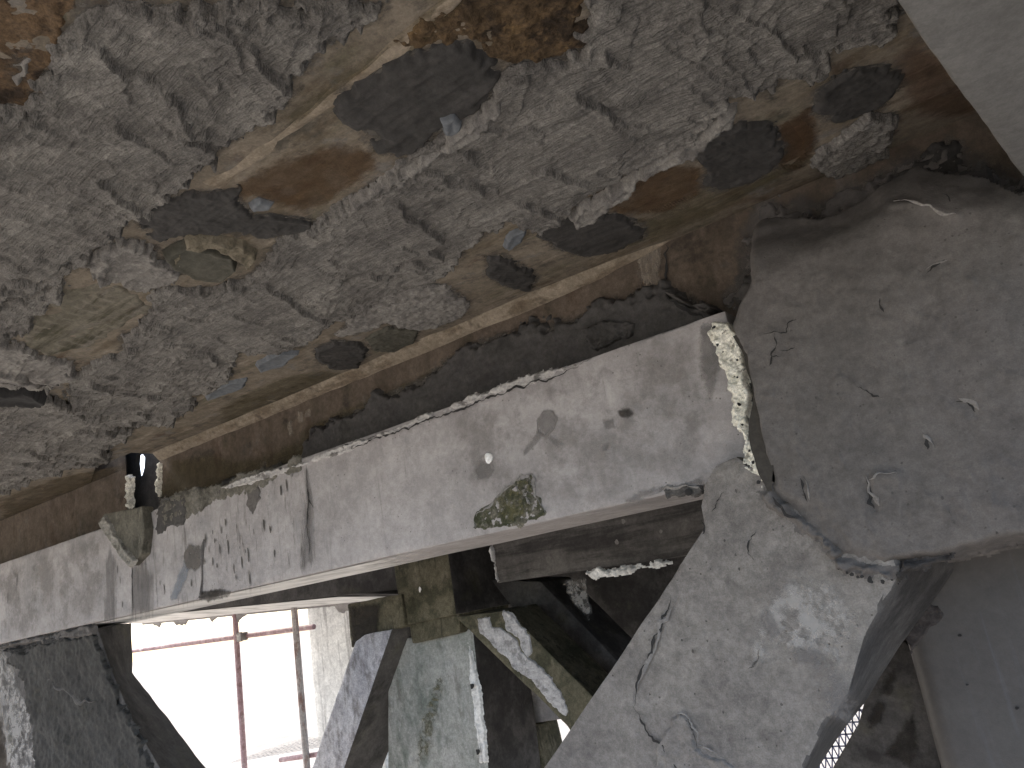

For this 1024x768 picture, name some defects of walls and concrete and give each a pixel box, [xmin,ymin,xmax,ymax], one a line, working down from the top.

peeling [24,283,151,355]
spalling [665,290,762,493]
peeling [154,363,581,534]
spalling [125,474,135,509]
crack [773,477,810,519]
crack [866,477,879,509]
spalling [205,520,249,570]
peeling [586,559,673,580]
peeling [477,610,568,716]
crack [633,596,678,768]